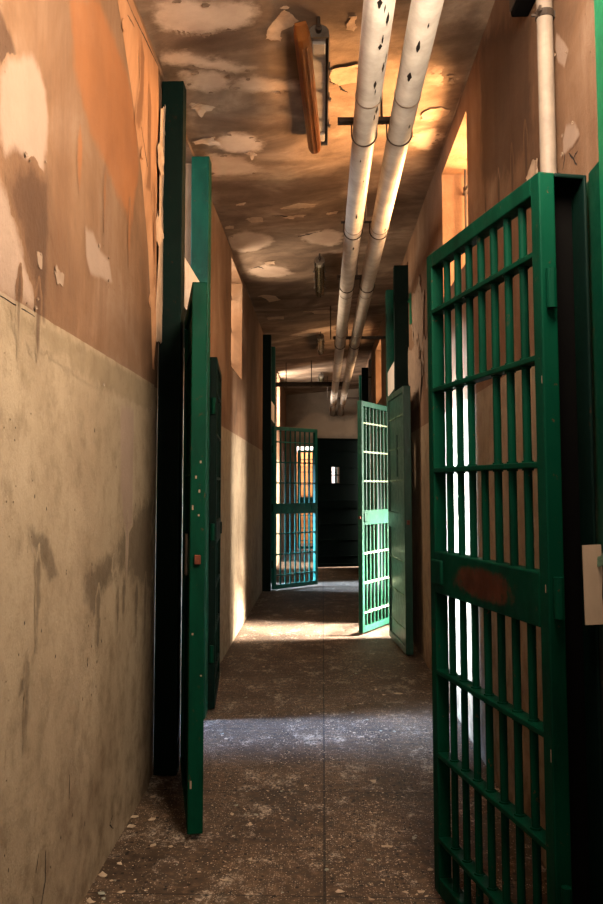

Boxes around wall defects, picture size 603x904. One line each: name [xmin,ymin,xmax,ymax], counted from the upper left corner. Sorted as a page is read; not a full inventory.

flaking render [148,0,263,38]
flaking render [266,6,299,41]
flaking render [157,48,301,117]
peeling [0,49,50,173]
flaking render [194,131,269,178]
peeling [0,175,40,314]
peeling [54,265,64,287]
peeling [84,224,113,285]
flaking render [225,217,276,253]
flaking render [242,261,297,278]